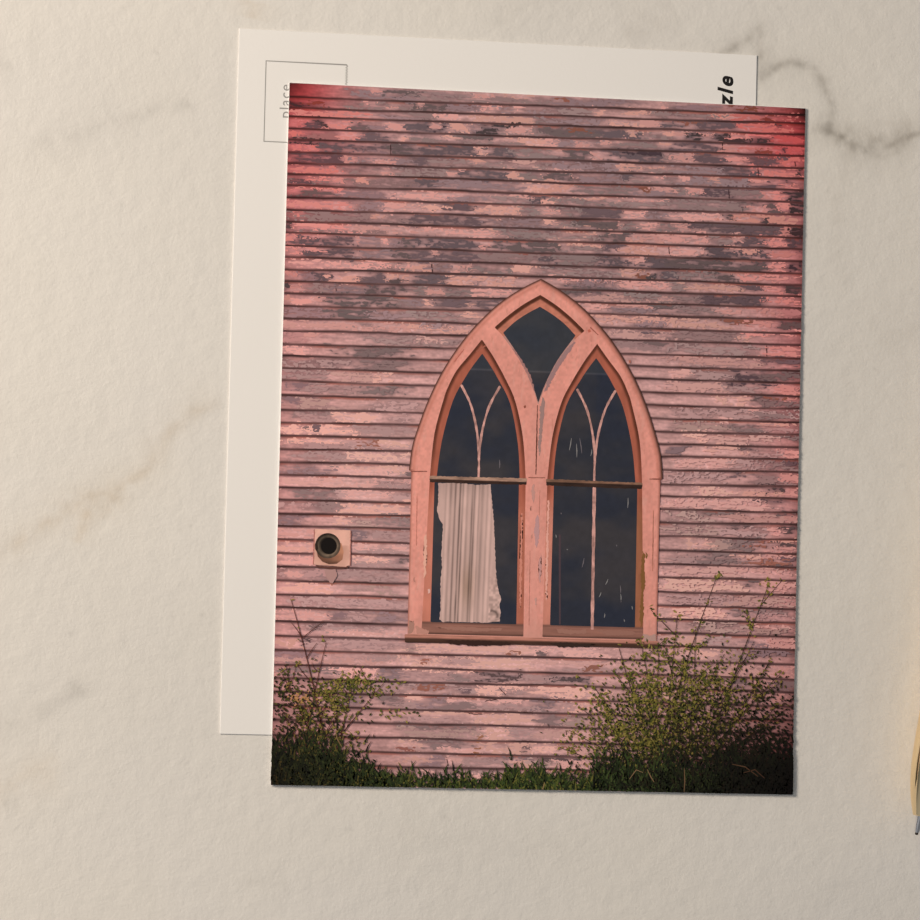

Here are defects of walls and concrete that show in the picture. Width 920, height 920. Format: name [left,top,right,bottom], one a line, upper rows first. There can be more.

peeling [277,87,805,608]